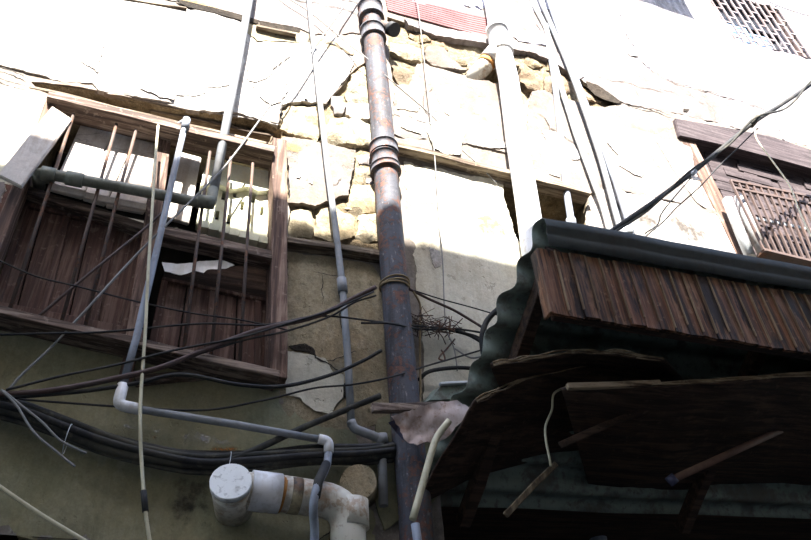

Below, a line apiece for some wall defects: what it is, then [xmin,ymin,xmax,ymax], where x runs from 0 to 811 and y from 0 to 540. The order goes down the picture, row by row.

spalling [177,0,301,33]
peeling [388,33,475,155]
flaking render [516,56,621,103]
flaking render [32,66,378,244]
peeling [656,140,706,208]
peeling [285,344,346,414]